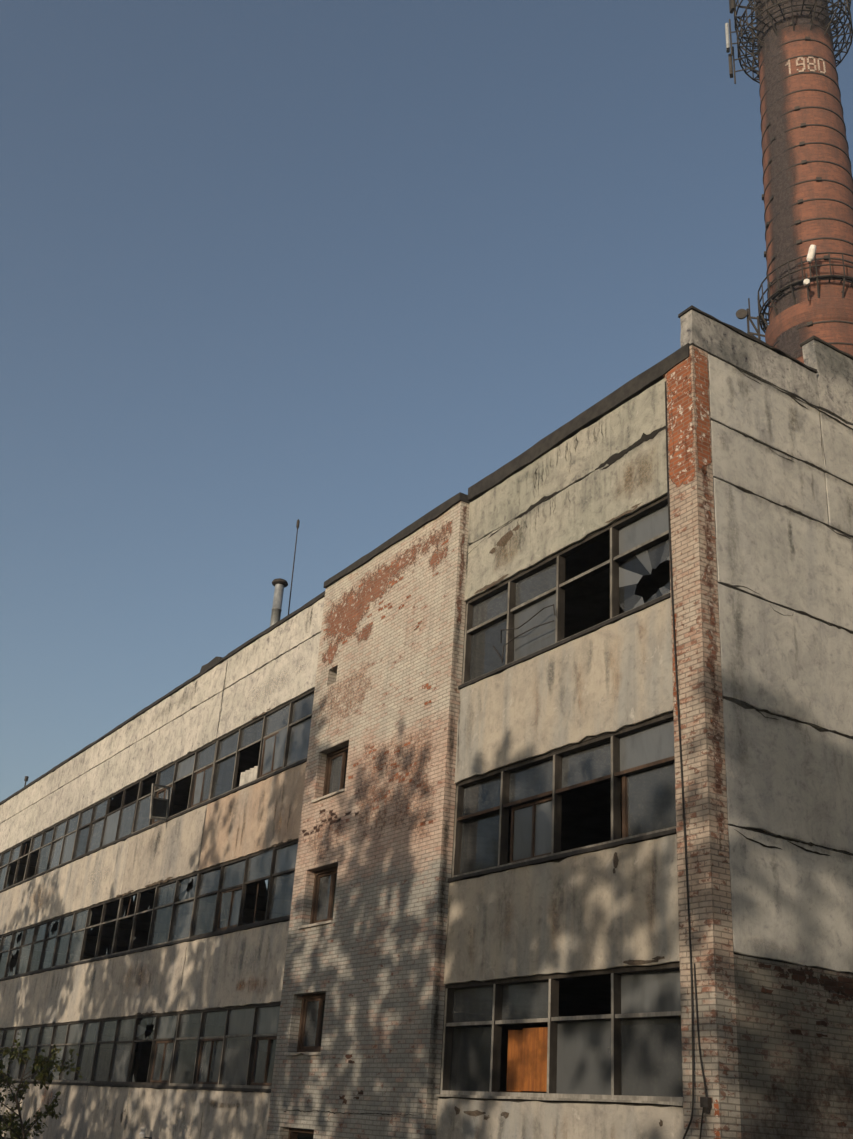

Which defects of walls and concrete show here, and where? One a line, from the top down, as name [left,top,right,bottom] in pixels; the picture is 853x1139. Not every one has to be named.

crack [468,425,666,554]
peeling [322,506,508,664]
peeling [666,350,724,849]
crack [719,581,853,634]
crack [724,697,853,738]
peeling [271,735,433,859]
crack [730,824,853,856]
spalling [755,962,853,1006]